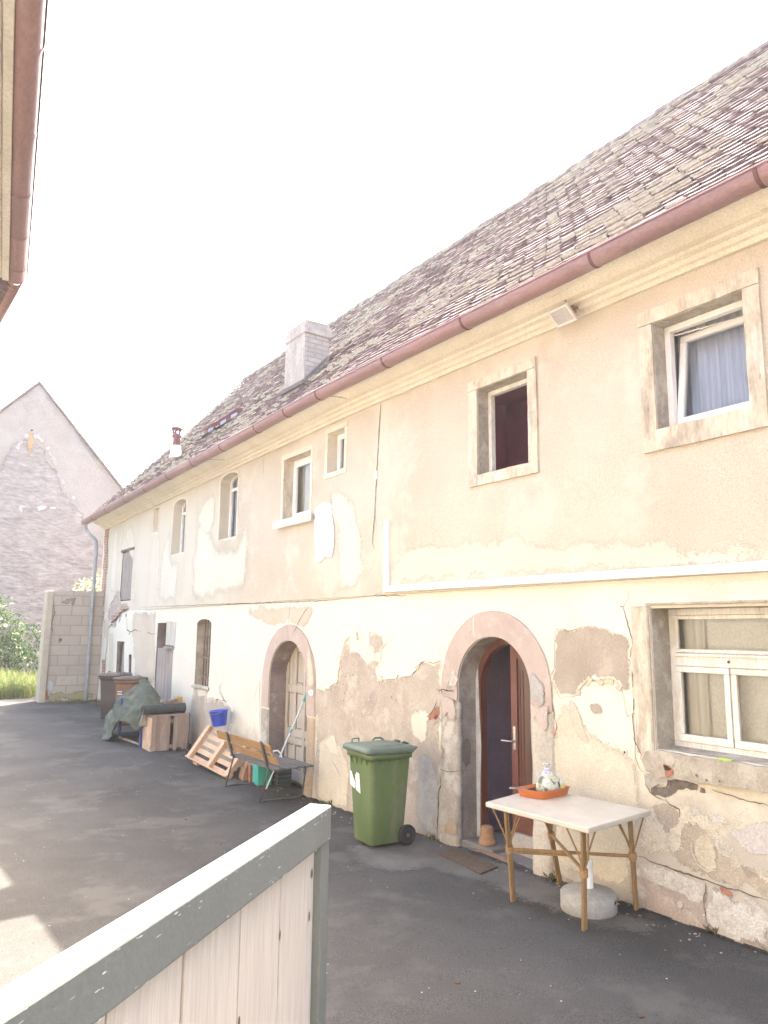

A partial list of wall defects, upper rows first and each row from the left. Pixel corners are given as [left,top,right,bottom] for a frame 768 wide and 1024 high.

crack [372,406,381,550]
peeling [307,630,458,840]
peeling [529,616,635,743]
crack [620,592,645,773]
spalling [644,760,768,834]
peeling [629,871,738,936]
peeling [737,930,768,951]